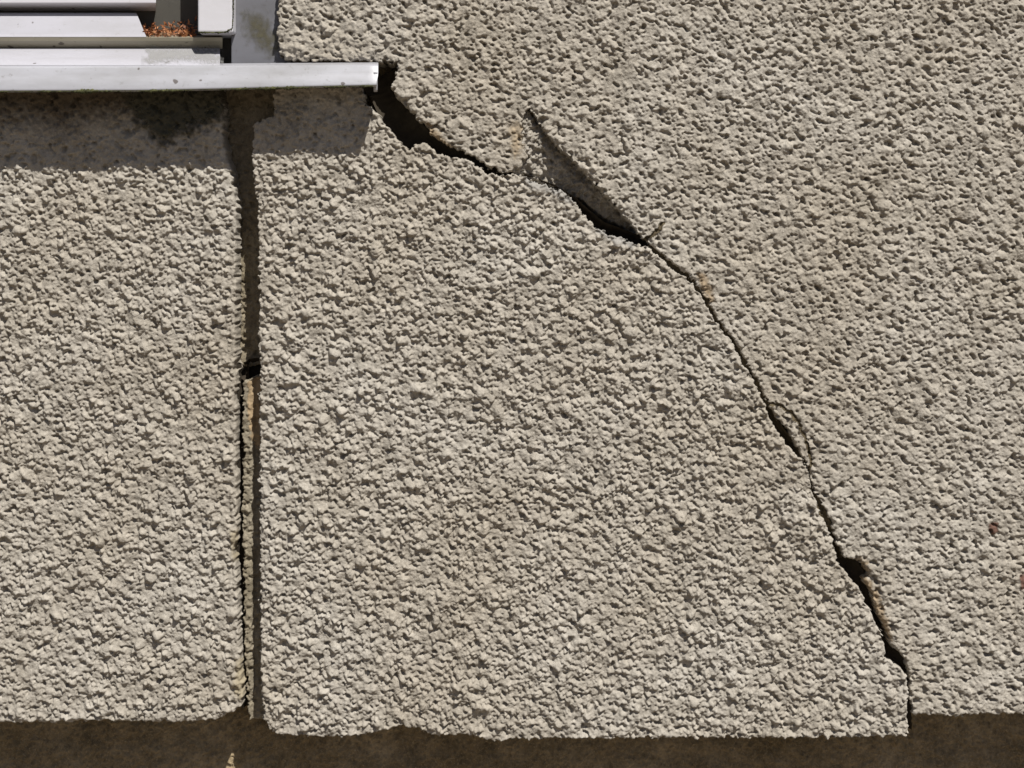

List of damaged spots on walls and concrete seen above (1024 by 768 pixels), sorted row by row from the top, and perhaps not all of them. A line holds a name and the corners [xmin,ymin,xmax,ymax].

crack [236,358,262,708]
crack [362,66,912,730]